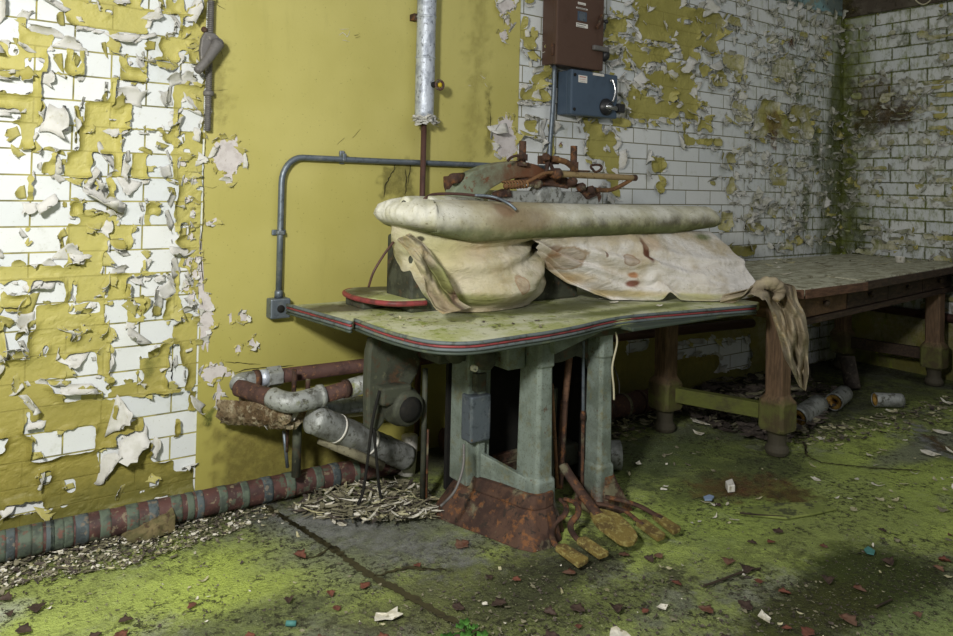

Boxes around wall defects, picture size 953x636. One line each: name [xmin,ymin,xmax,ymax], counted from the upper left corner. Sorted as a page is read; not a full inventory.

peeling [487,0,562,161]
peeling [576,0,953,262]
peeling [0,0,251,530]
peeling [233,333,260,355]
peeling [611,338,655,396]
peeling [677,315,766,388]